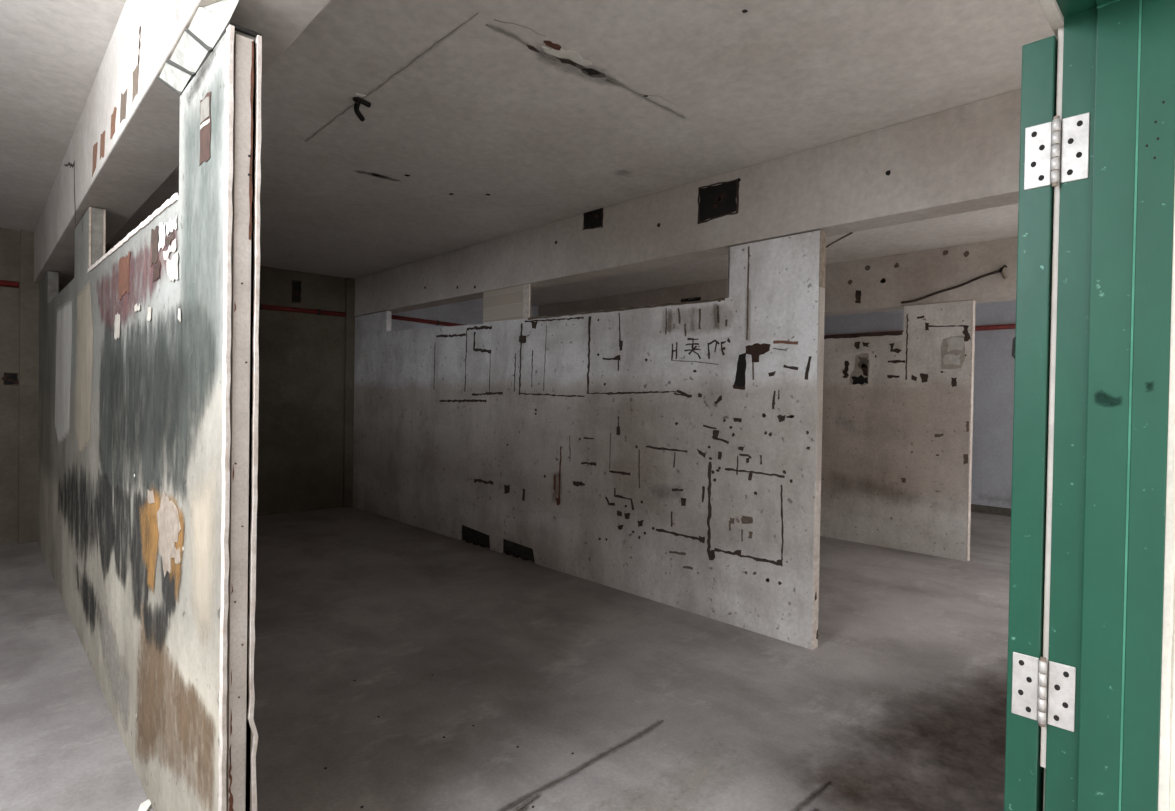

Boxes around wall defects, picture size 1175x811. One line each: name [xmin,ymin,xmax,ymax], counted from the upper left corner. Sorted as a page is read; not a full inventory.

crack [606,77,686,119]
damp [58,87,220,807]
peeling [147,489,184,577]
crack [501,720,664,811]
crack [797,782,830,811]